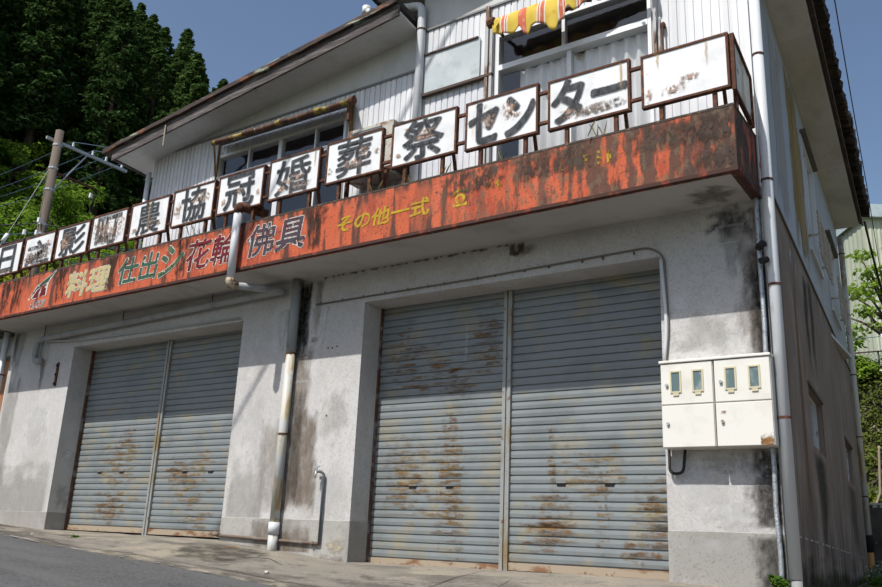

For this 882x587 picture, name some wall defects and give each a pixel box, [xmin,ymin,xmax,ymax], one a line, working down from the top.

water stain [712,207,771,354]
water stain [284,283,328,509]
water stain [280,531,308,552]
rust [436,422,463,534]
rust [530,495,570,542]
water stain [817,460,828,530]